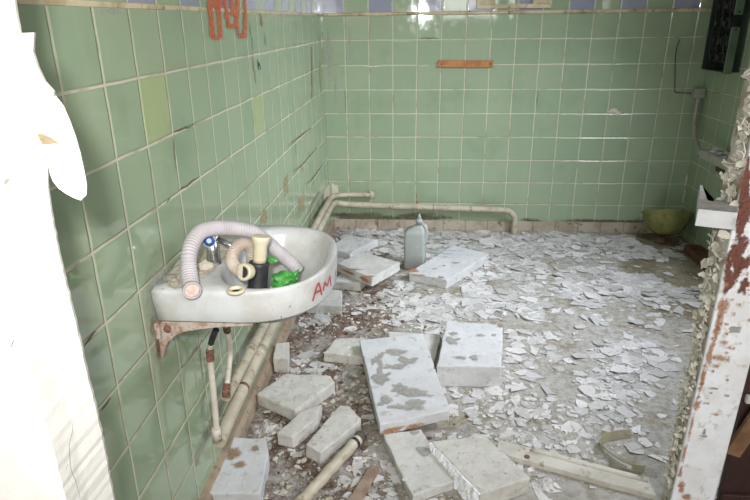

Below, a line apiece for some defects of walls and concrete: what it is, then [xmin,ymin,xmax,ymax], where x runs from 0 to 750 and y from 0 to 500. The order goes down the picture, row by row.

peeling [716,68,750,207]
peeling [664,228,732,489]
rust [689,156,750,435]
spalling [429,442,480,500]
rust [678,446,690,500]